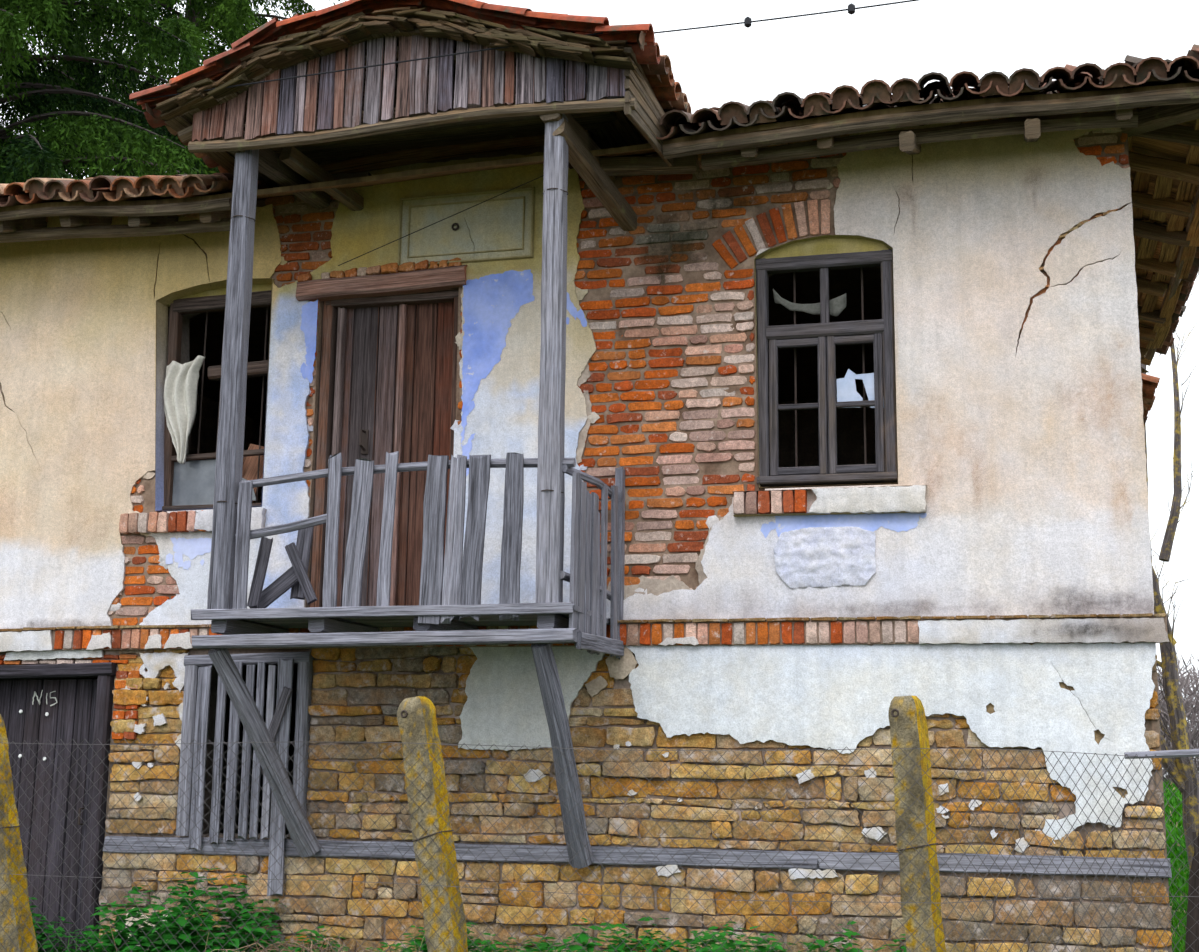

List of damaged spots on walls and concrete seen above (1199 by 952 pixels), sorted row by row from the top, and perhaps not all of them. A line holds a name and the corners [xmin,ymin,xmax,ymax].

spalling [257,195,340,288]
crack [1016,199,1138,353]
peeling [450,269,535,476]
spalling [566,152,846,600]
spalling [130,471,160,513]
flaking render [54,533,222,834]
flaking render [306,647,566,844]
flaking render [569,620,919,853]
flaking render [926,713,1166,858]
flaking render [1144,691,1162,770]
flaking render [656,865,681,877]
flaking render [789,868,838,879]